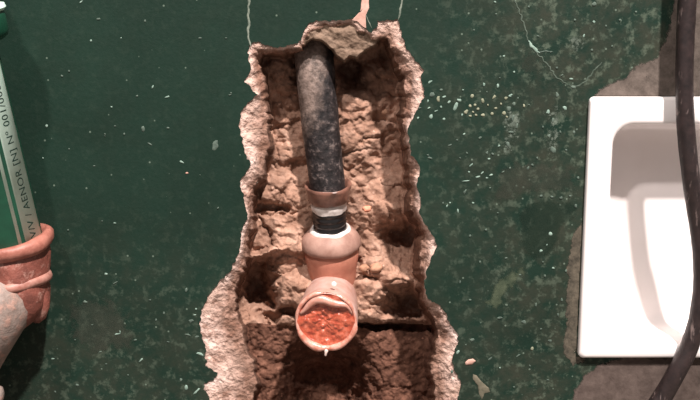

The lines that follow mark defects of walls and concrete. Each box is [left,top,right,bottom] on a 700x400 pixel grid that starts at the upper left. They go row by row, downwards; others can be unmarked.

crack [245,0,253,46]
crack [514,0,602,87]
flaking render [180,0,530,400]